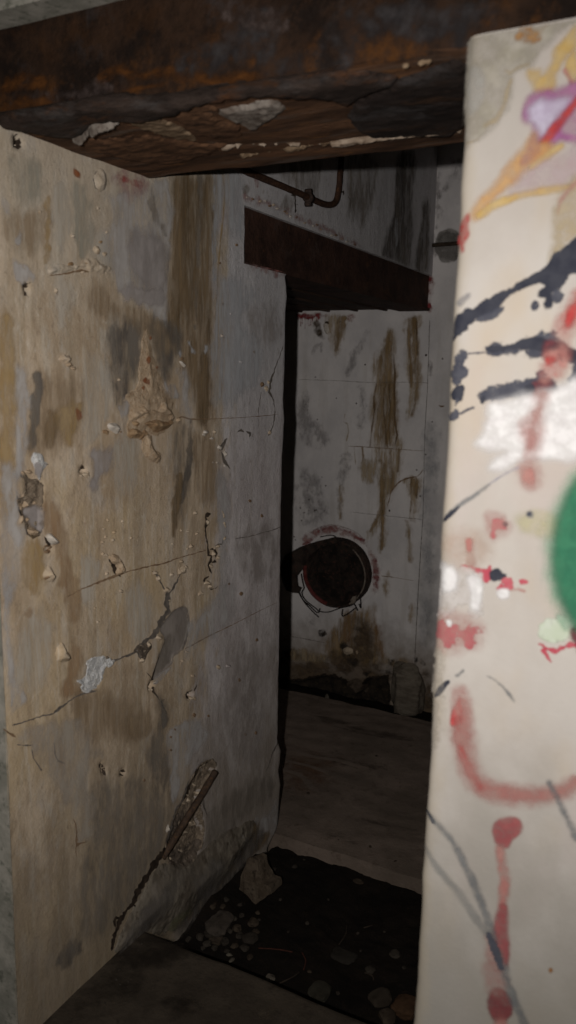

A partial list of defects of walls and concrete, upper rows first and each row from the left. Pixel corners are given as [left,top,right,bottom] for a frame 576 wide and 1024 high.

leakage [0,165,242,591]
leakage [355,317,427,550]
peeling [15,452,59,554]
crack [114,511,226,713]
spalling [77,655,115,693]
crack [3,690,97,771]
spalling [165,759,217,868]